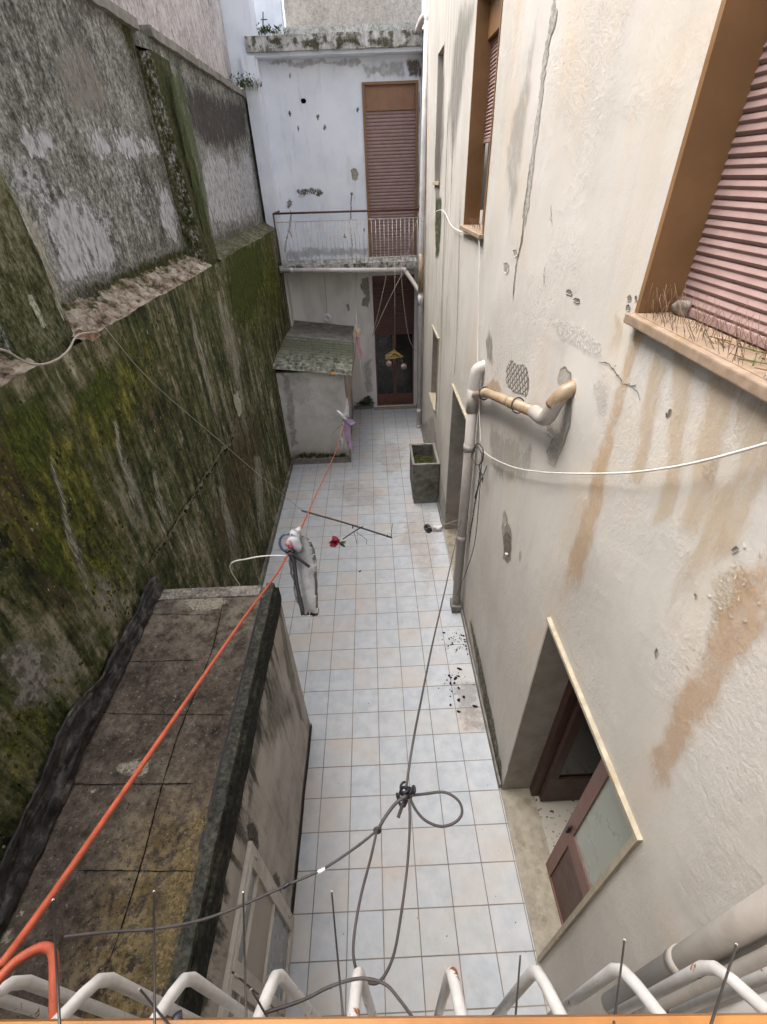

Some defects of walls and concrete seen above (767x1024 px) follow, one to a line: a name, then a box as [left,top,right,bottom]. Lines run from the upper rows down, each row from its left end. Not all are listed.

damp [407,60,421,77]
crack [513,0,557,293]
damp [22,197,115,321]
damp [190,311,216,413]
damp [217,291,249,435]
crack [599,362,640,400]
damp [51,464,80,568]
damp [113,422,132,498]
damp [254,456,265,538]
spalling [503,513,511,559]
damp [180,597,228,611]
damp [248,823,259,850]